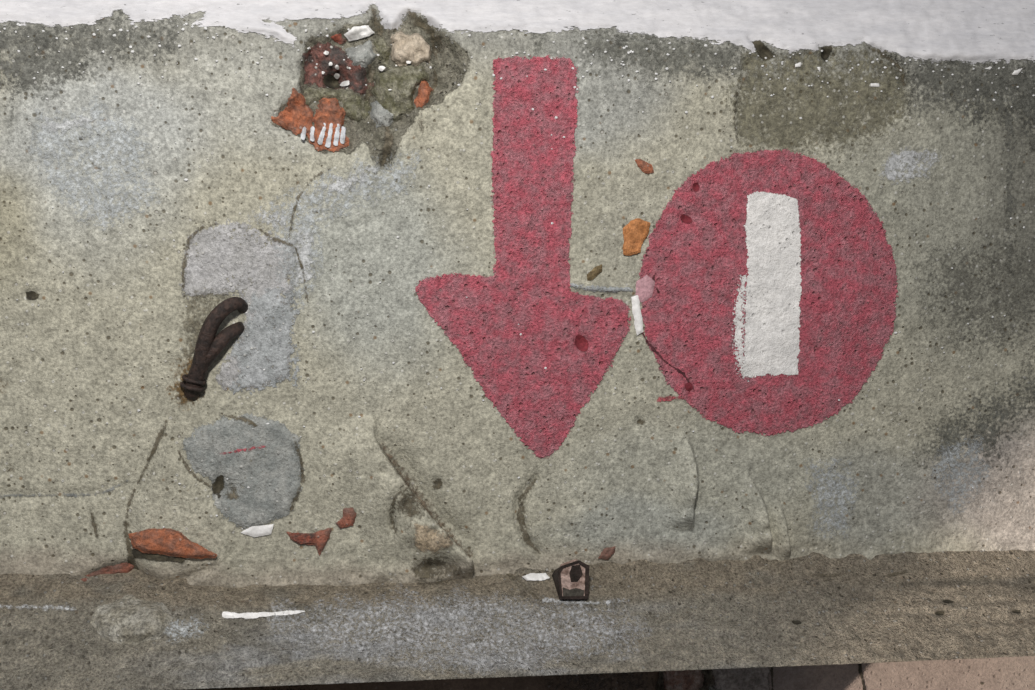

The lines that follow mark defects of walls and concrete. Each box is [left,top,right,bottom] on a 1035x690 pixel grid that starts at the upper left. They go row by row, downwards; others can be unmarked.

spalling [271,6,470,170]
water stain [573,28,1035,513]
corrosion [167,290,227,404]
spalling [655,669,714,690]
crack [858,663,866,690]